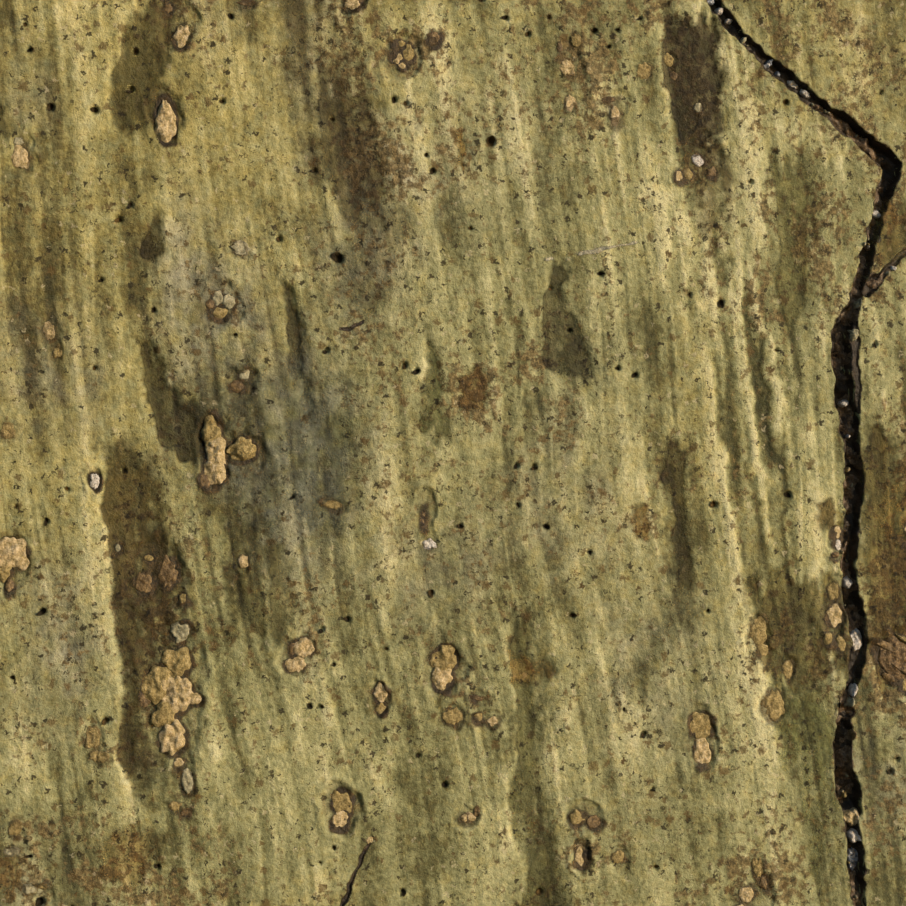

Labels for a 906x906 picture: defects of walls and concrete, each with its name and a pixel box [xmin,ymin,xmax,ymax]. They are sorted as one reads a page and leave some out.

crack [340,836,374,906]
crack [707,0,906,906]